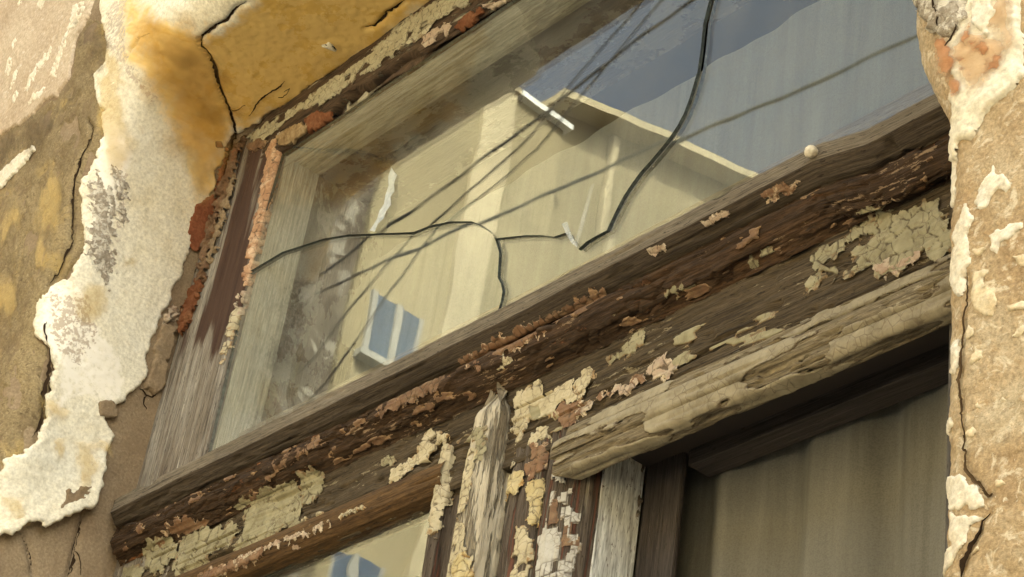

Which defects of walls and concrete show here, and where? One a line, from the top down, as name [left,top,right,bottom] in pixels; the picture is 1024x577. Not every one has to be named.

crack [201,2,290,161]
crack [365,0,404,27]
flaking render [912,0,995,38]
flaking render [0,1,131,465]
crack [49,110,105,285]
peeling [143,0,510,395]
peeling [803,156,1024,316]
peeling [122,435,366,577]
peeling [381,425,488,577]
peeling [505,329,679,577]
peeling [949,325,983,374]
crack [956,272,993,577]